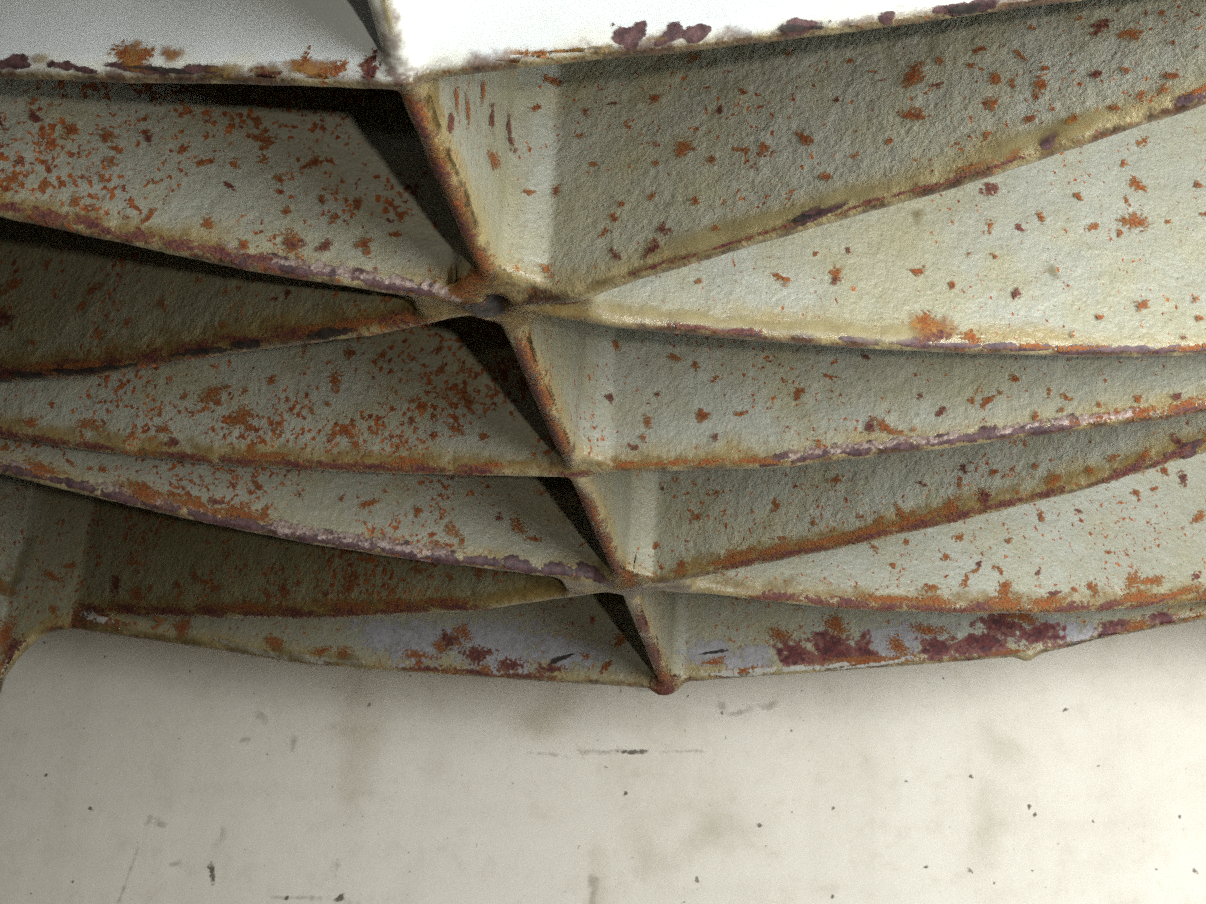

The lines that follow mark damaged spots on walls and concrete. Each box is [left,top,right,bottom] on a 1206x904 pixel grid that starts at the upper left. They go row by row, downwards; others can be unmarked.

spalling [879,11,895,26]
spalling [933,0,1000,17]
spalling [0,53,32,70]
spalling [47,39,223,77]
rust [250,45,381,81]
rust [507,48,582,87]
rust [818,49,1122,216]
rust [0,76,518,415]
rust [605,306,1206,361]
rust [1083,427,1206,497]
rust [671,462,1066,578]
rust [704,558,1206,678]